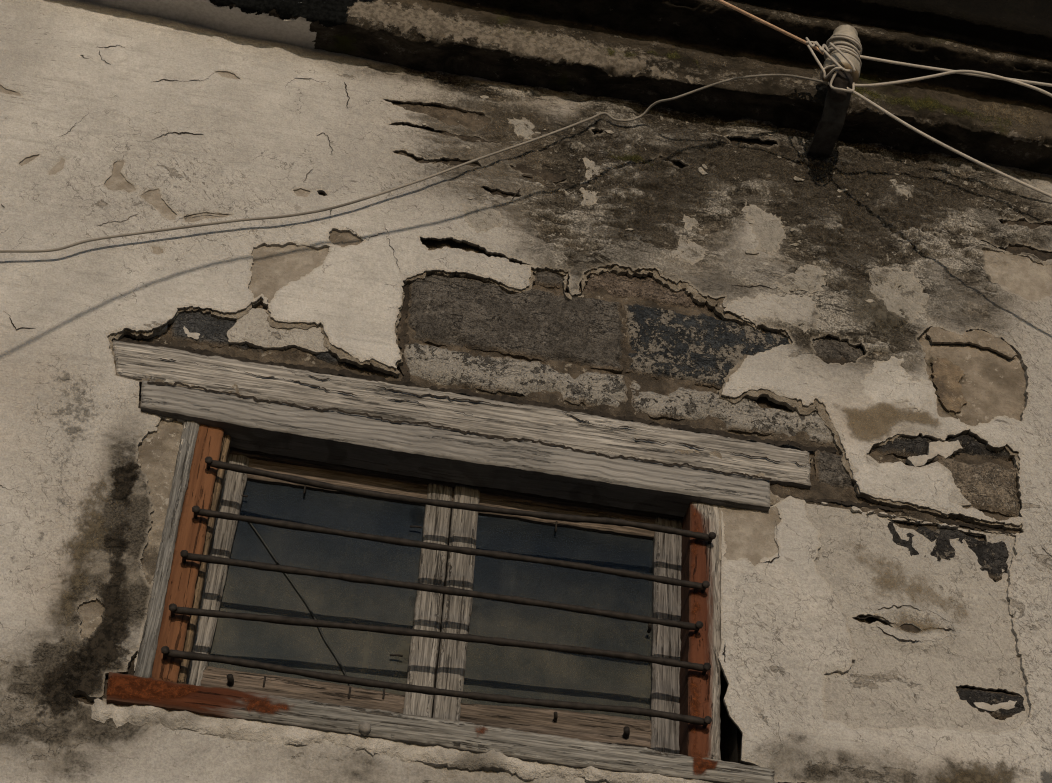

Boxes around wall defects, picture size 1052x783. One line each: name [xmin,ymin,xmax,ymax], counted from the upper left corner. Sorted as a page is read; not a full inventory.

flaking render [507,117,546,142]
flaking render [104,161,228,222]
flaking render [580,158,607,206]
flaking render [889,173,918,201]
flaking render [671,214,709,265]
flaking render [741,199,799,257]
water stain [849,284,909,341]
water stain [52,369,102,482]
flaking render [108,231,1030,733]
water stain [37,462,140,719]
rust [106,676,197,699]
rust [244,699,289,714]